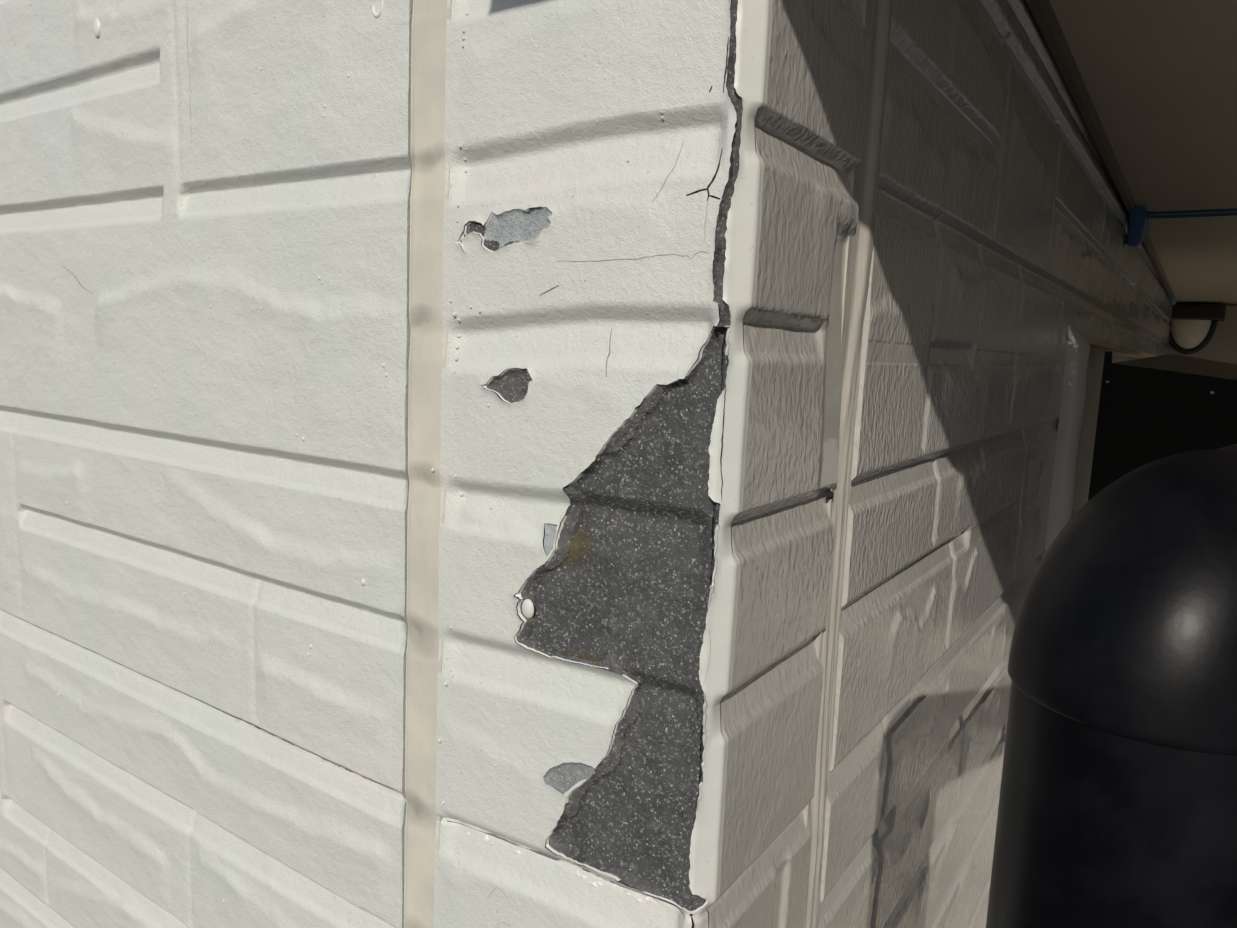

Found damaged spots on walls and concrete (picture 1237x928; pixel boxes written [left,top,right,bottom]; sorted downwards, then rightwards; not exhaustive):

crack [539,0,742,326]
peeling [455,207,552,252]
peeling [482,368,533,404]
peeling [515,326,730,913]
crack [447,821,694,928]